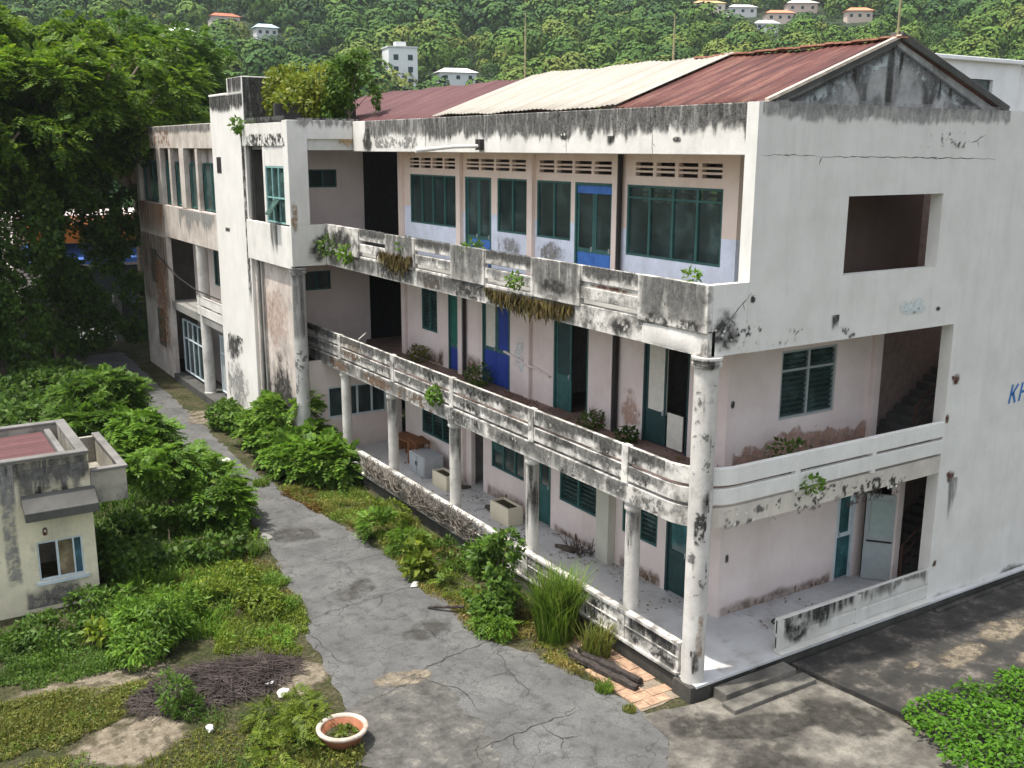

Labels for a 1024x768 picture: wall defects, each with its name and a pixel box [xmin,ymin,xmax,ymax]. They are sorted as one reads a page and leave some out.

damp [296,102,748,151]
crack [762,136,988,164]
damp [310,229,706,325]
spalling [714,314,762,348]
damp [228,334,247,404]
damp [290,269,665,523]
peeling [733,422,866,466]
damp [0,454,89,581]
spalling [688,494,709,563]
spalling [724,505,764,529]
spalling [795,474,902,513]
damp [784,570,926,642]